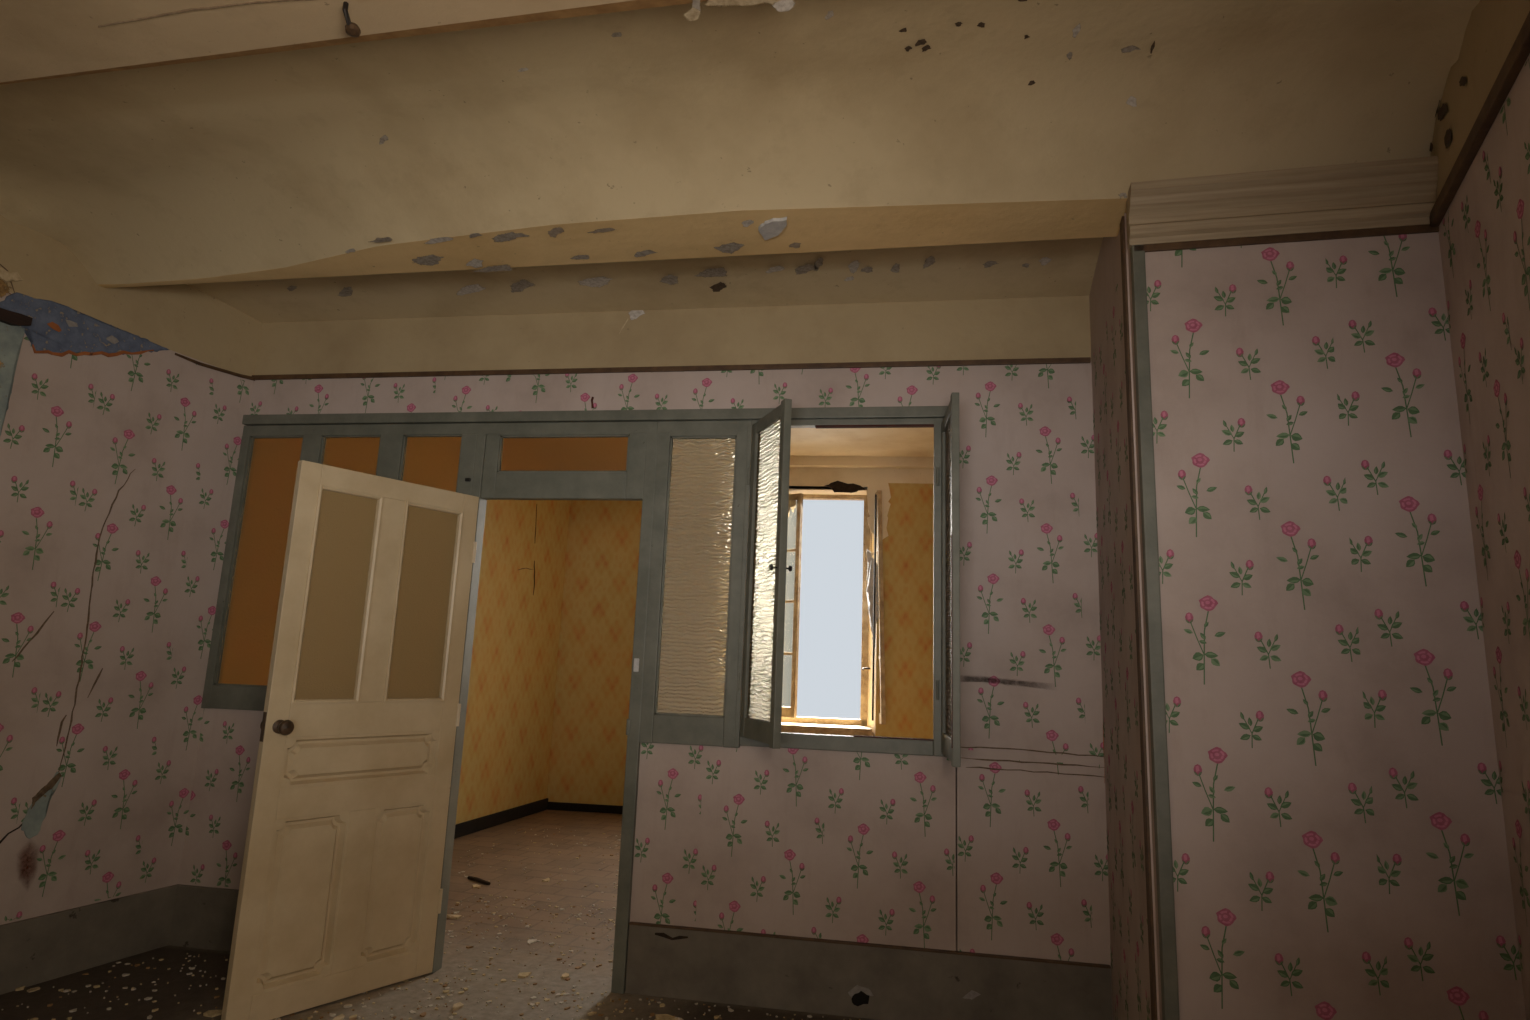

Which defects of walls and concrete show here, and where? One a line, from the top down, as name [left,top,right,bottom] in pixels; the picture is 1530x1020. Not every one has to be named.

peeling [684,0,795,21]
peeling [412,232,529,266]
peeling [695,217,801,292]
peeling [0,267,169,436]
crack [12,469,135,772]
flaking render [848,985,874,1006]